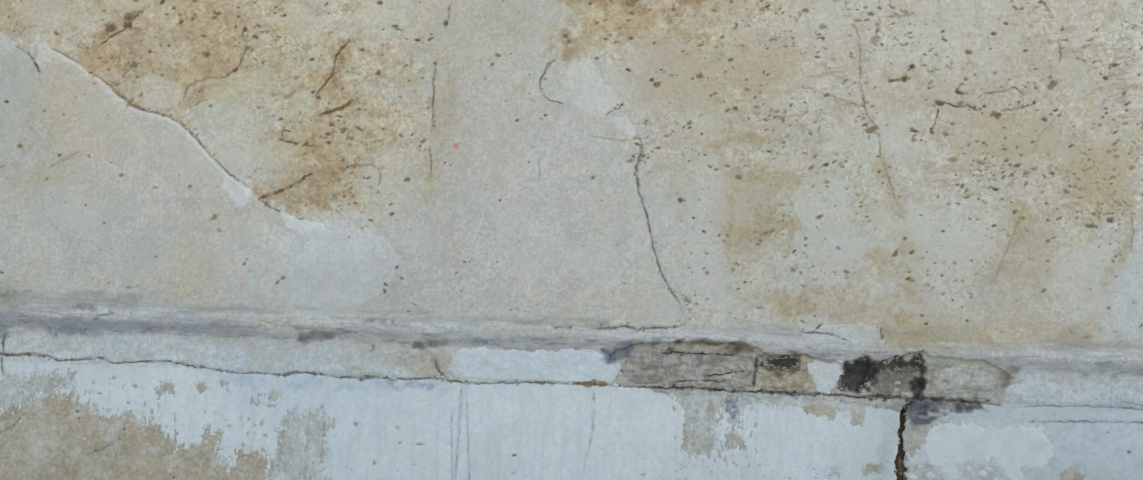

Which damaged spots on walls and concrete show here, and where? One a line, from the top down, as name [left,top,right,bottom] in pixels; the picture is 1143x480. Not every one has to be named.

spalling [0,0,685,332]
crack [0,106,1143,480]
flaking render [800,323,885,343]
flaking render [1102,233,1143,346]
peeling [0,365,337,480]
spalling [451,343,1054,480]
peeling [1059,463,1086,480]